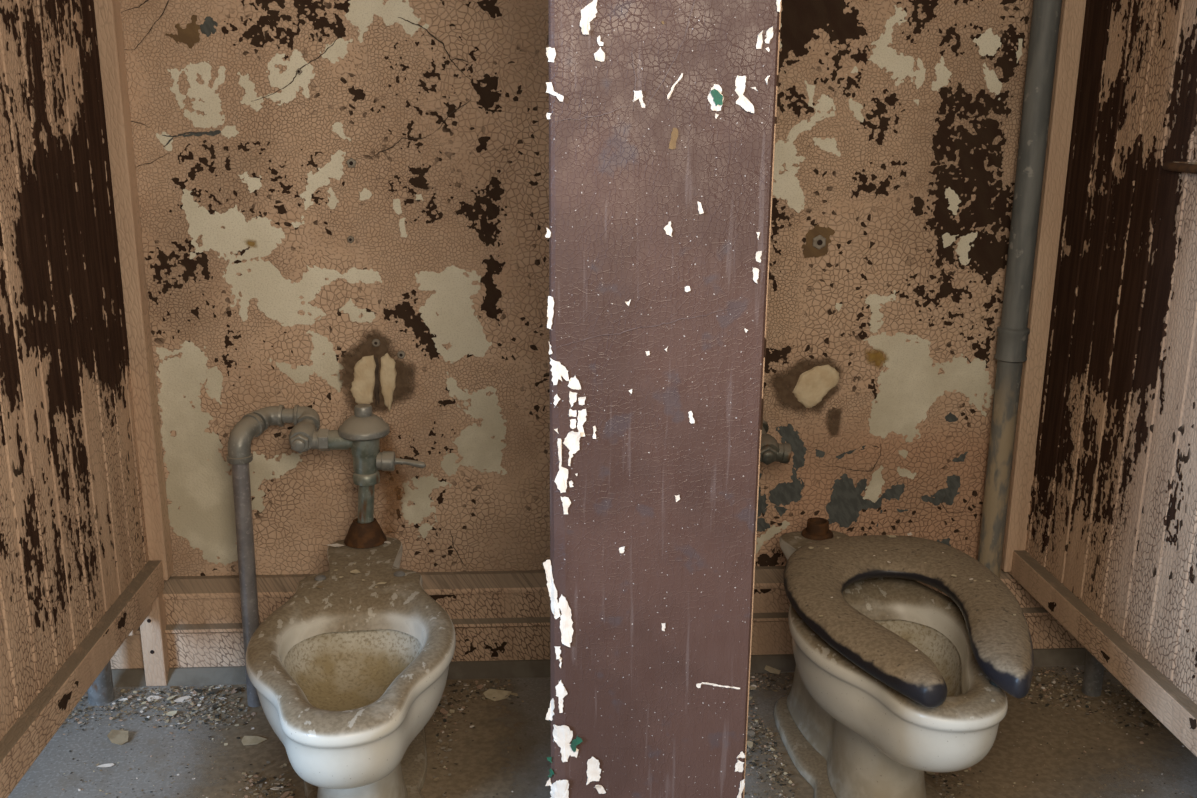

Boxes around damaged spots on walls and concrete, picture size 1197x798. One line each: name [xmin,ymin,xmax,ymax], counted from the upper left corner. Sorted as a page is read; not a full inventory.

crack [121,0,169,50]
crack [131,121,220,167]
crack [251,36,340,102]
crack [369,17,474,159]
peeling [580,0,605,62]
peeling [0,0,131,638]
flaking render [145,0,507,566]
leakage [340,332,414,411]
peeling [547,296,596,514]
peeling [707,0,1028,566]
peeling [1027,0,1197,553]
peeling [543,560,606,798]